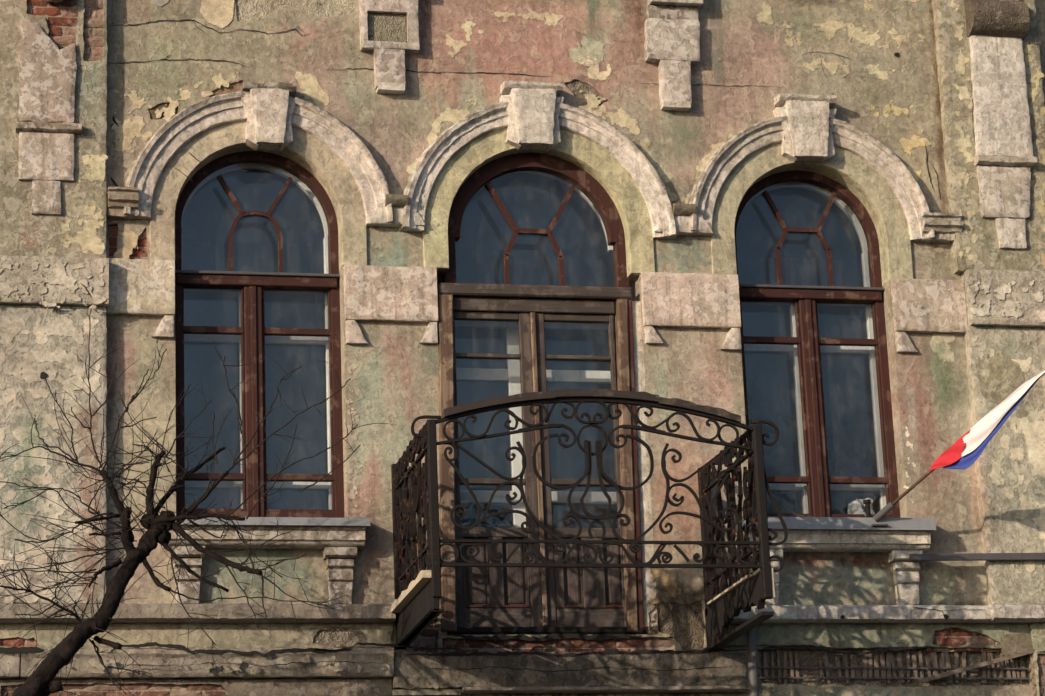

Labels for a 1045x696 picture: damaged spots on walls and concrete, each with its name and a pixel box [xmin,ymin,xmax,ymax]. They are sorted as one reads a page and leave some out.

flaking render [26,0,151,68]
crack [120,55,246,67]
crack [110,19,310,36]
peeling [444,21,485,57]
peeling [1024,41,1045,123]
peeling [77,74,243,193]
peeling [564,30,691,205]
peeling [695,133,733,180]
crack [925,145,941,199]
peeling [1030,140,1045,232]
peeling [965,277,1045,323]
peeling [0,205,148,603]